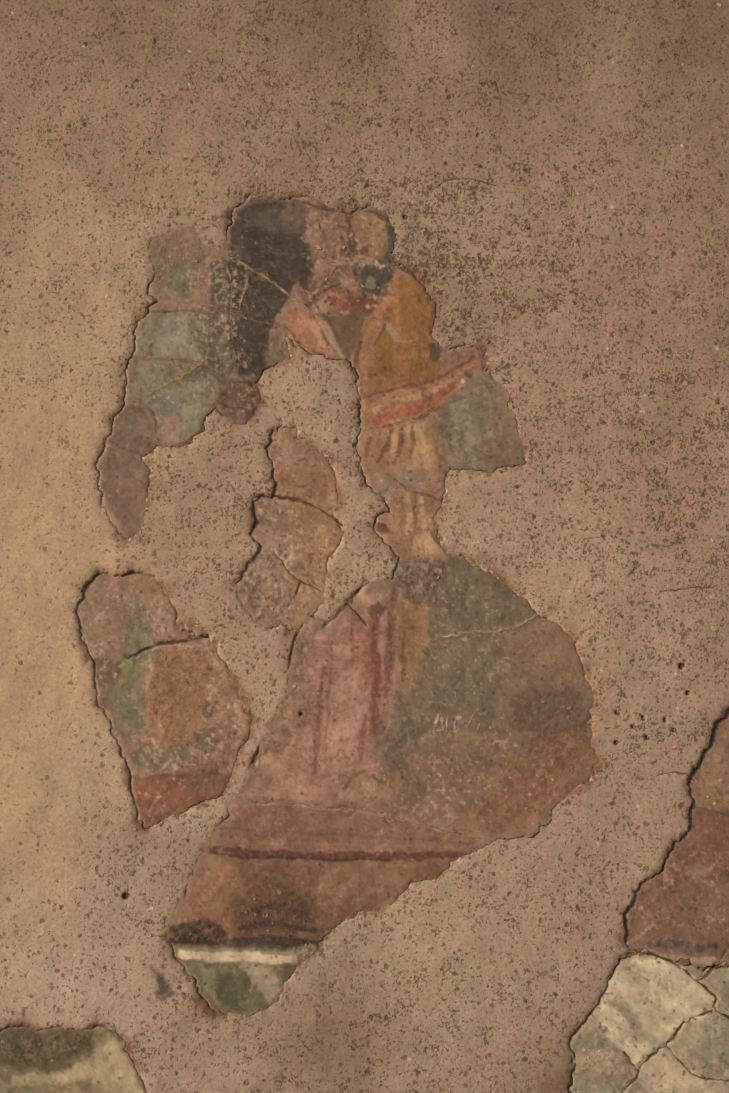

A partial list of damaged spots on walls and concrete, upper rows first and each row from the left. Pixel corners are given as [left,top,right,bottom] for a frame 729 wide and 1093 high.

crack [132,253,316,398]
crack [241,495,343,527]
crack [274,553,313,608]
crack [127,636,210,659]
crack [322,582,369,629]
crack [430,614,538,641]
crack [621,951,729,1093]